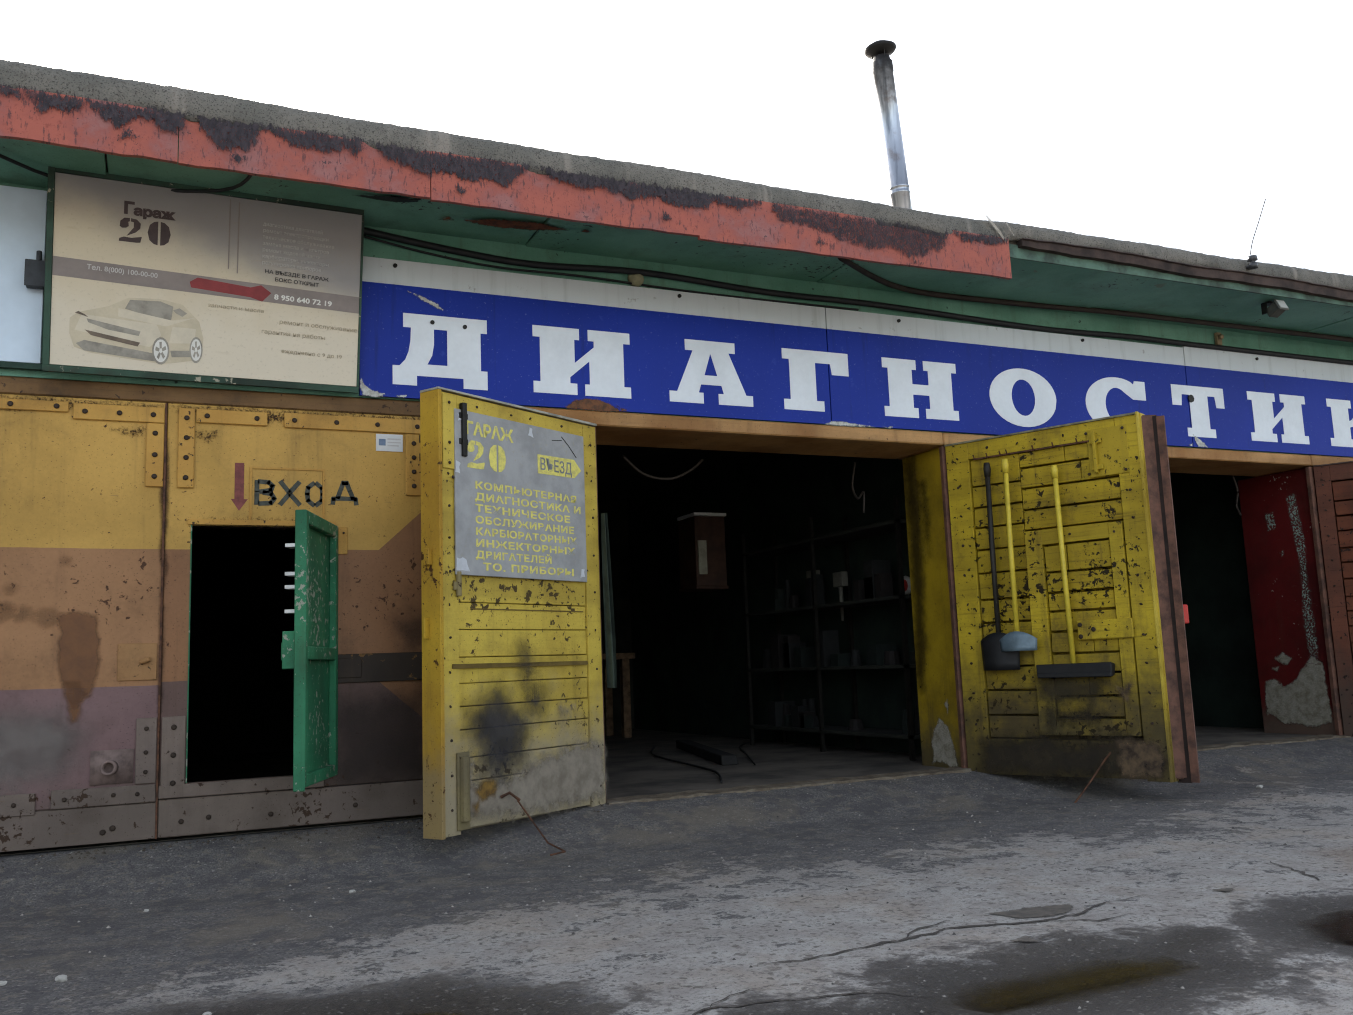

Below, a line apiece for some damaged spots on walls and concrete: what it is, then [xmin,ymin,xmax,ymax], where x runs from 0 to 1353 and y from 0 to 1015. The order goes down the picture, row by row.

peeling [0,83,1008,267]
spalling [1265,496,1332,727]
crack [692,896,1137,1015]